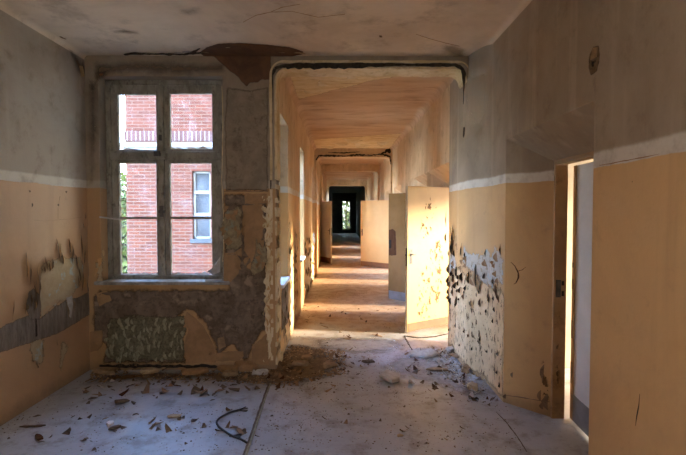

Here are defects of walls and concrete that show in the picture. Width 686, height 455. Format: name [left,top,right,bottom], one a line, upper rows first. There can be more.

hole [589,46,600,75]
spalling [0,43,315,365]
peeling [417,217,513,399]